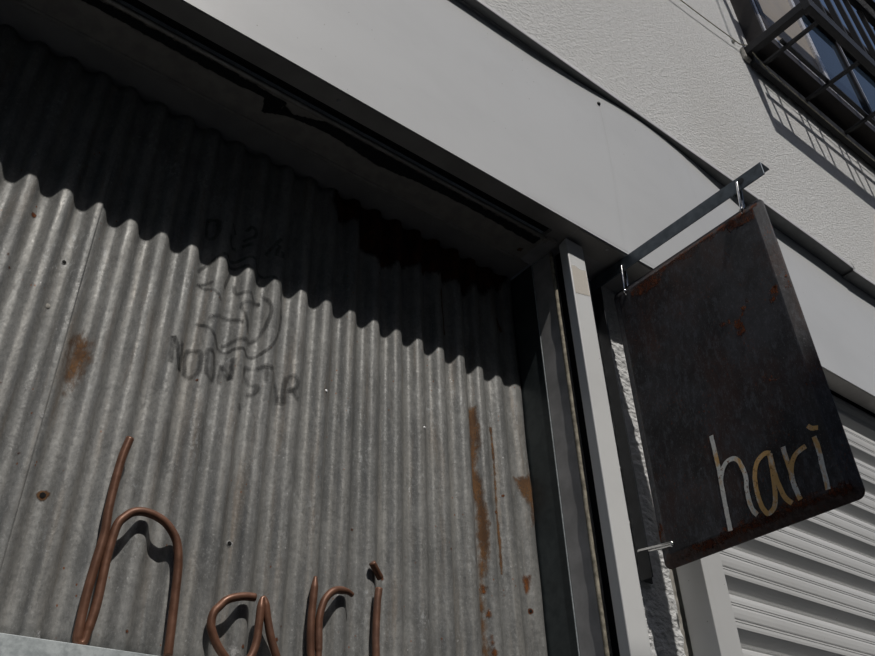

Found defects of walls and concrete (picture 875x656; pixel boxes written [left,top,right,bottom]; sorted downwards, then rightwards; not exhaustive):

corrosion [468,407,505,656]
corrosion [513,476,534,521]